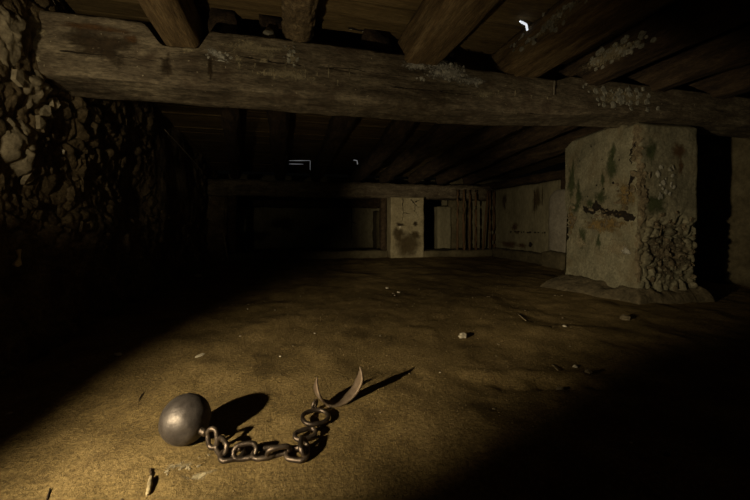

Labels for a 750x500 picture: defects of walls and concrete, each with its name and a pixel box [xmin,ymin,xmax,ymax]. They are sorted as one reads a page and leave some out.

flaking render [583,196,636,233]
damp [394,229,419,255]